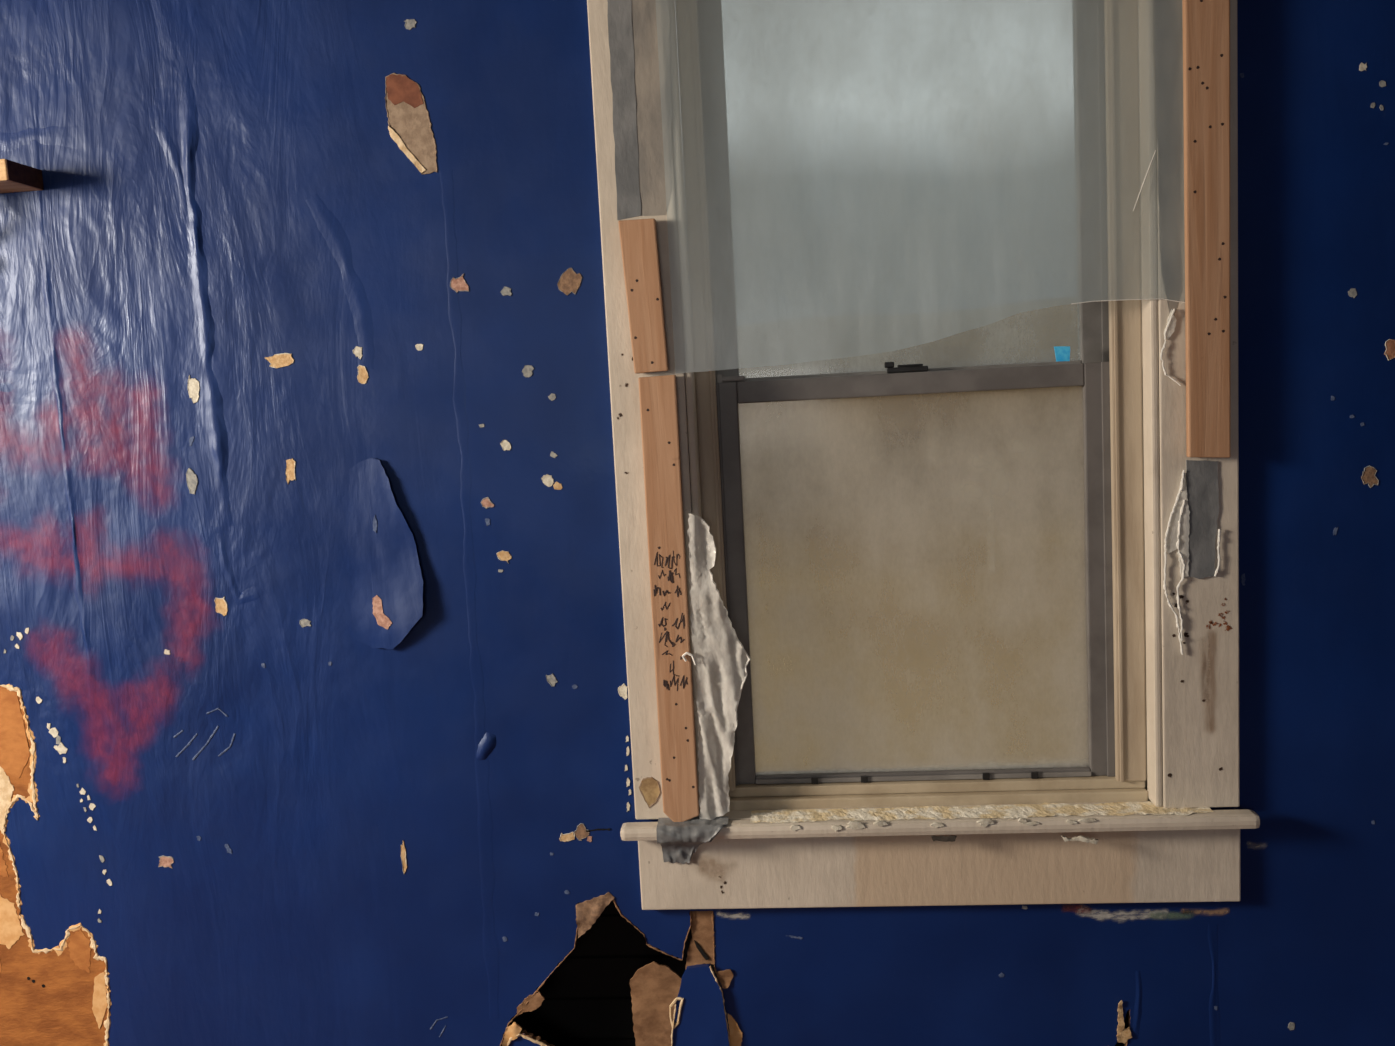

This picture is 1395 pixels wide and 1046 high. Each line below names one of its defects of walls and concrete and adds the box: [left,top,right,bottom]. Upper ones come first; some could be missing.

peeling [47,723,68,763]
peeling [76,784,97,831]
spalling [500,890,743,1046]
spalling [1116,971,1142,1044]